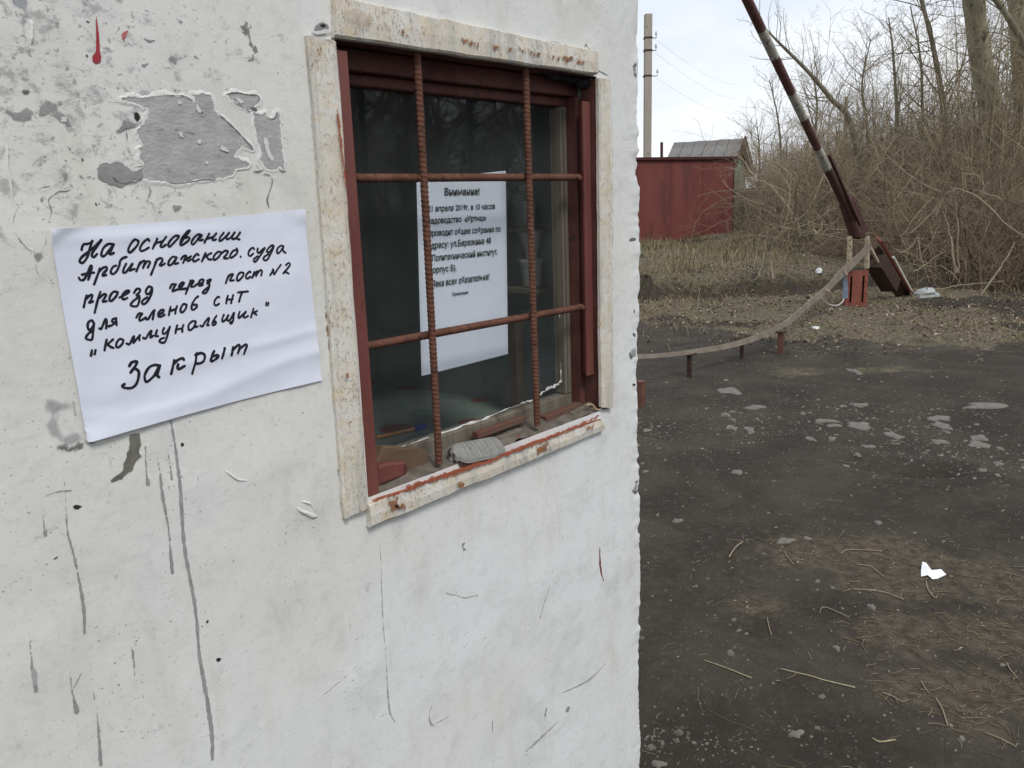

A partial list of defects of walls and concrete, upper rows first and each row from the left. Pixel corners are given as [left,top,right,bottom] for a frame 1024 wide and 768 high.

corrosion [493,45,585,64]
flaking render [97,88,288,206]
corrosion [372,415,602,510]
water stain [111,421,214,760]